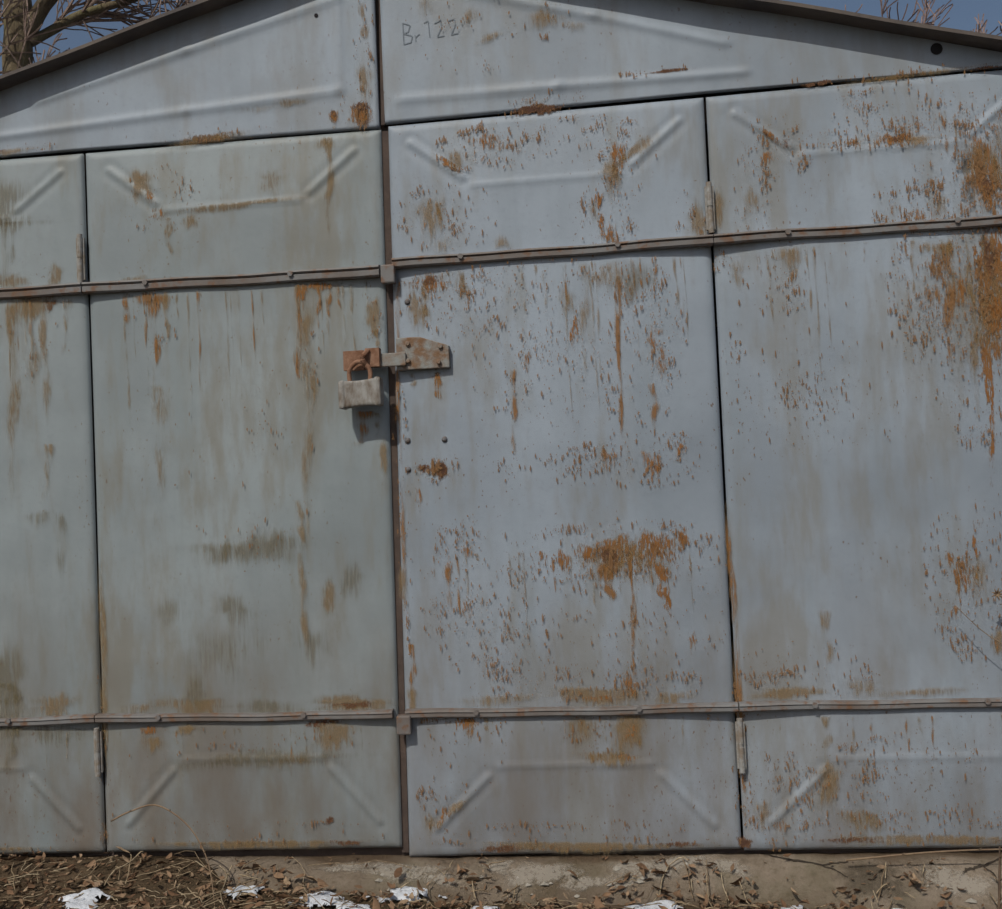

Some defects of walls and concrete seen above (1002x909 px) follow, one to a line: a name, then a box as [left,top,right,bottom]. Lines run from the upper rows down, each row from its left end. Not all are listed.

corrosion [330,0,374,131]
corrosion [397,183,484,250]
corrosion [435,88,657,243]
corrosion [734,63,1002,460]
corrosion [286,282,341,399]
corrosion [397,255,701,488]
corrosion [380,370,458,589]
corrosion [402,515,737,709]
corrosion [923,504,1002,662]
corrosion [730,641,825,740]
corrosion [416,778,696,853]
corrosion [731,716,1002,852]